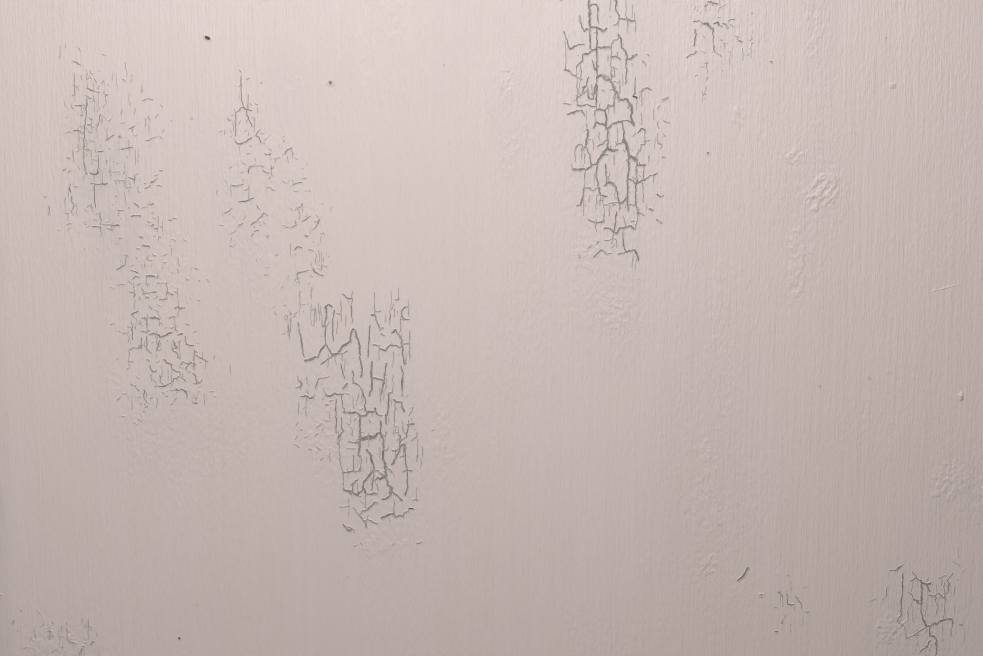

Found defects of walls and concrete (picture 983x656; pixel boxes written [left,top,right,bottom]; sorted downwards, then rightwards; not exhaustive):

crack [43,43,232,425]
crack [216,69,434,547]
crack [560,0,670,271]
crack [686,0,774,102]
crack [868,547,966,656]